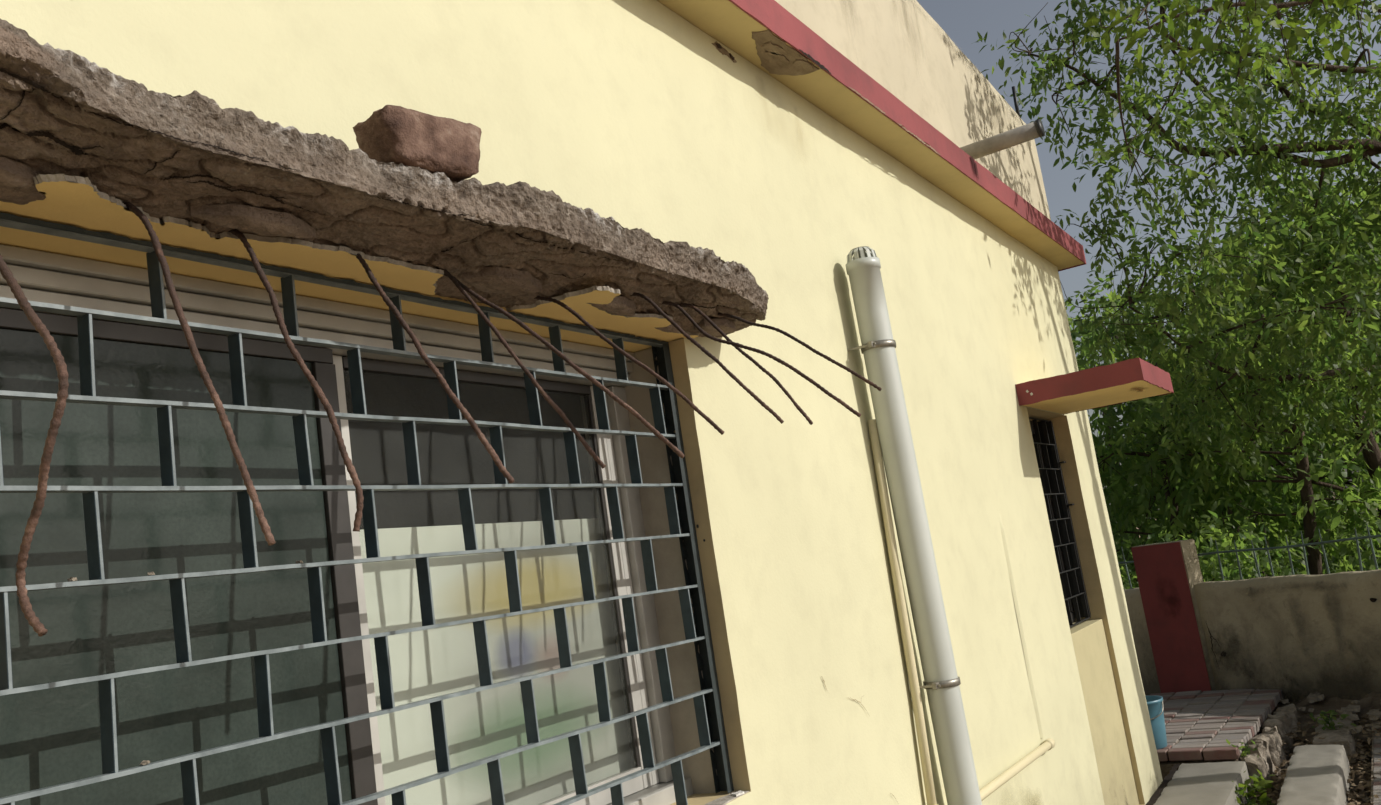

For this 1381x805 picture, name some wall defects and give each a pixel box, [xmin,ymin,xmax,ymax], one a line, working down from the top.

peeling [711,41,737,63]
peeling [752,30,831,76]
crack [0,69,317,214]
spalling [0,71,882,546]
crack [367,195,624,279]
spalling [0,254,69,637]